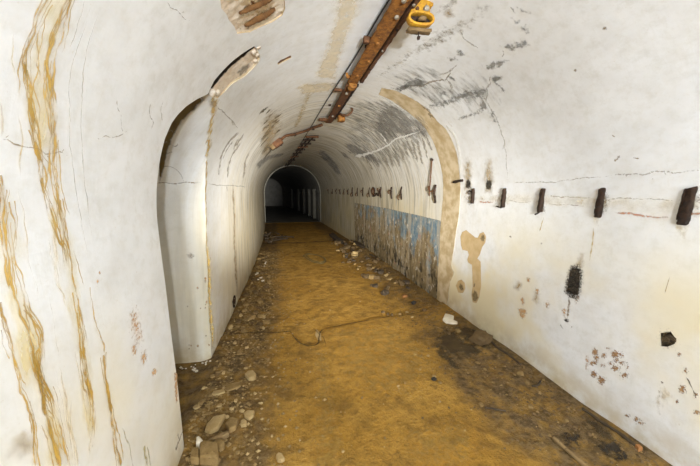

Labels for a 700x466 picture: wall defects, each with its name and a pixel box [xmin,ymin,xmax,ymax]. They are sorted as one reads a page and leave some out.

spalling [220,0,284,32]
spalling [208,46,261,98]
water stain [397,75,495,122]
water stain [344,102,432,168]
crack [355,130,423,158]
crack [447,123,461,178]
corrosion [17,0,95,427]
corrosion [0,175,70,466]
peeling [456,230,486,303]
spalling [562,264,583,322]
spalling [660,331,676,346]
corrosion [90,293,123,465]